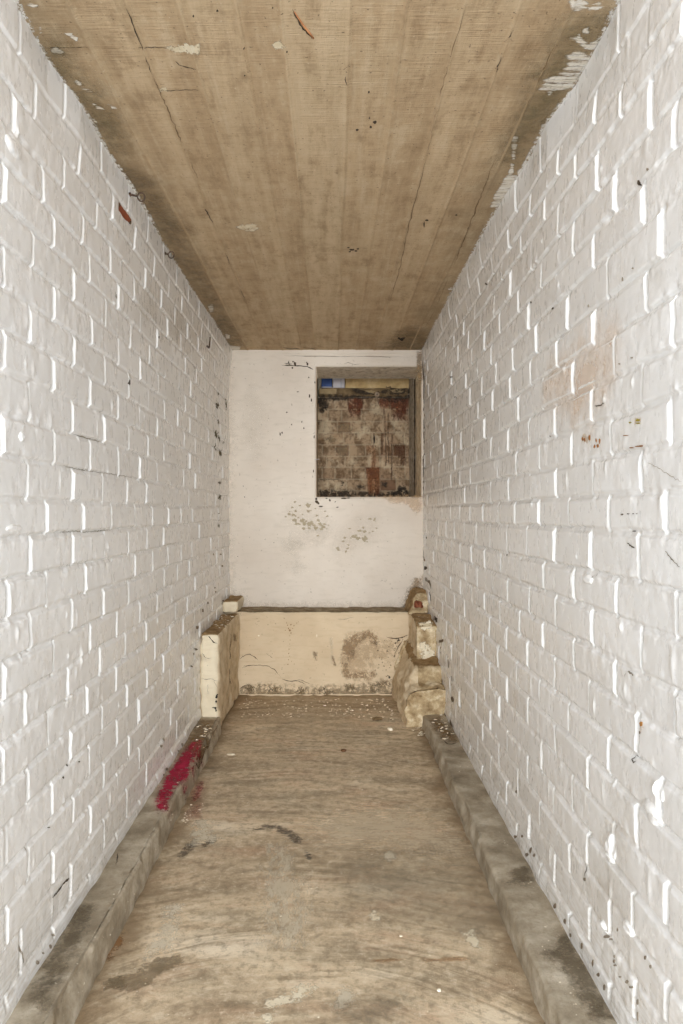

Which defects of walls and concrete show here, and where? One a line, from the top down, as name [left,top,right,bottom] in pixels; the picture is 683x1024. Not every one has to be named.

corrosion [378,399,408,421]
corrosion [366,445,380,496]
peeling [285,497,349,537]
leakage [229,631,403,695]